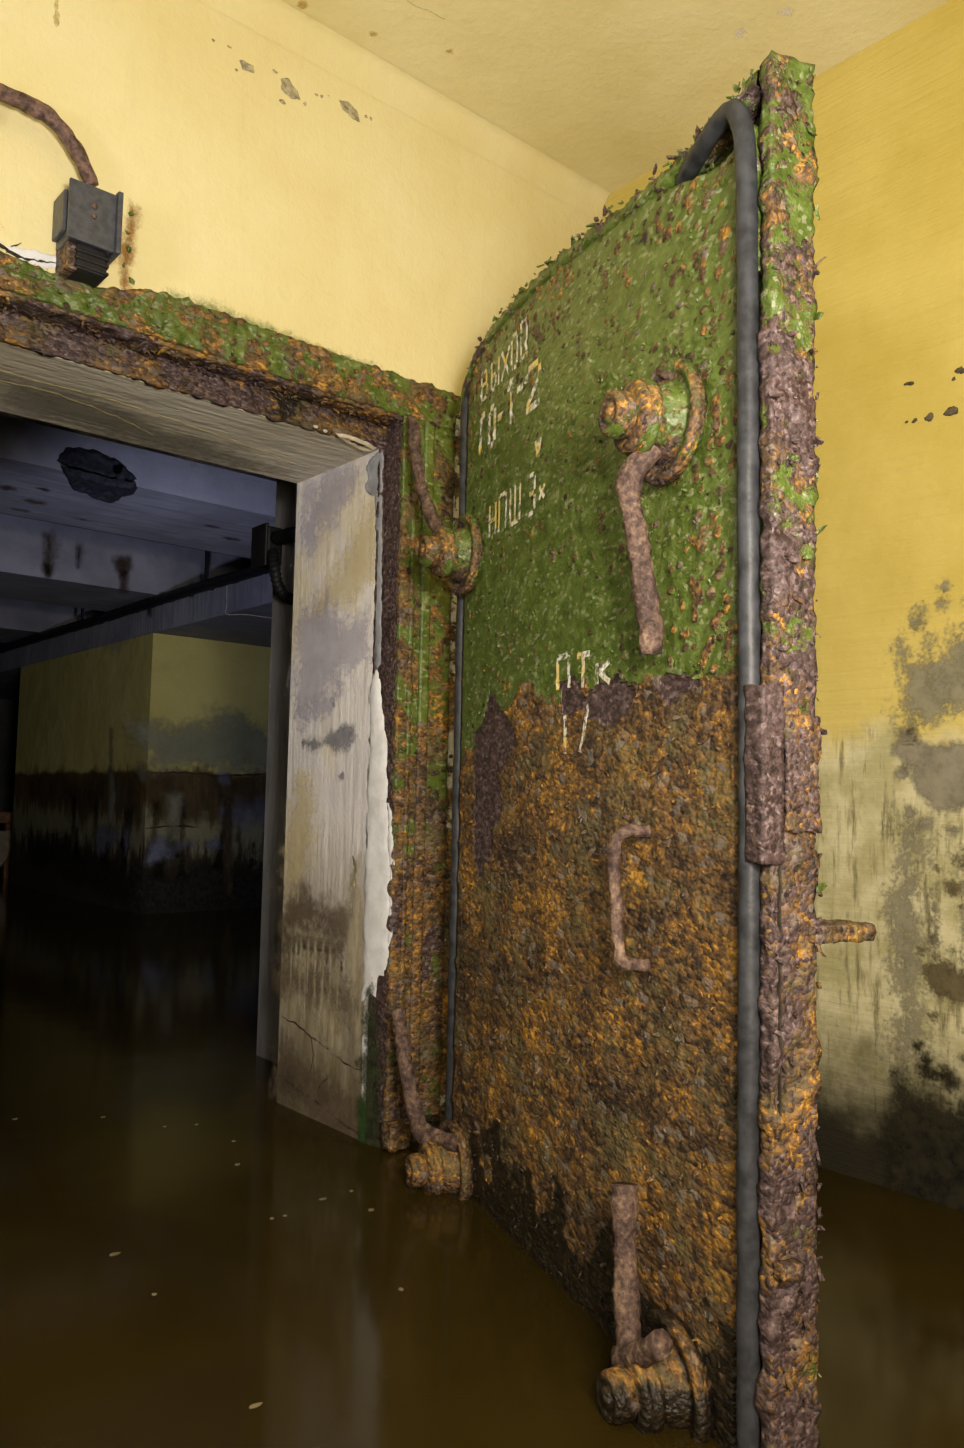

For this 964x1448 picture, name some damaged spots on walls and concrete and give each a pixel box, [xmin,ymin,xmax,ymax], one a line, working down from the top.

peeling [273,69,372,122]
corrosion [120,207,137,290]
corrosion [0,297,402,429]
flaking render [0,240,460,463]
corrosion [44,535,52,576]
spalling [56,447,138,503]
corrosion [116,557,131,593]
peeling [313,425,384,669]
water stain [890,581,964,732]
water stain [29,729,266,915]
water stain [276,777,365,1055]
water stain [880,806,964,1212]